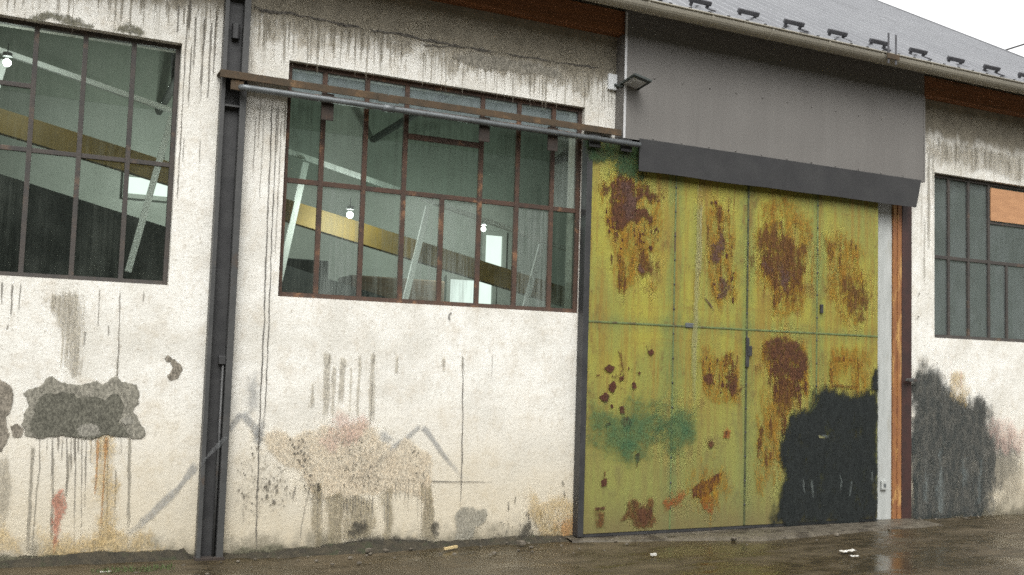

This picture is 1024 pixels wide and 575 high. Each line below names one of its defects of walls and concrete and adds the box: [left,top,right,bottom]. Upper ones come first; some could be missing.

damp [177,1,217,197]
corrosion [600,171,665,293]
corrosion [705,196,737,309]
corrosion [750,196,871,325]
damp [924,137,1023,273]
spalling [0,380,24,451]
damp [52,294,86,364]
spalling [164,355,183,381]
corrosion [702,348,742,405]
corrosion [754,336,809,496]
damp [238,435,439,546]
corrosion [621,497,656,528]